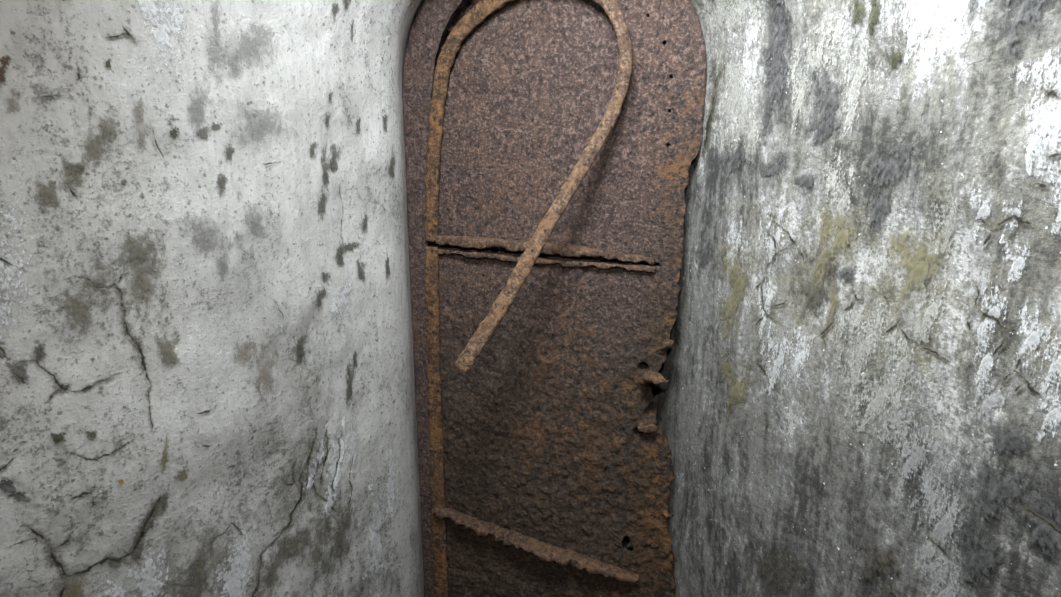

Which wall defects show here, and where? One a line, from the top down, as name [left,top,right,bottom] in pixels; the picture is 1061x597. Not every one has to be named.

damp [848,0,865,26]
damp [711,0,816,189]
damp [802,67,842,146]
crack [752,219,804,328]
damp [797,208,856,329]
damp [861,141,948,310]
crack [0,272,153,429]
rust [638,371,669,385]
crack [12,495,161,597]
crack [66,442,130,507]
crack [210,425,353,597]
damp [956,421,1061,583]